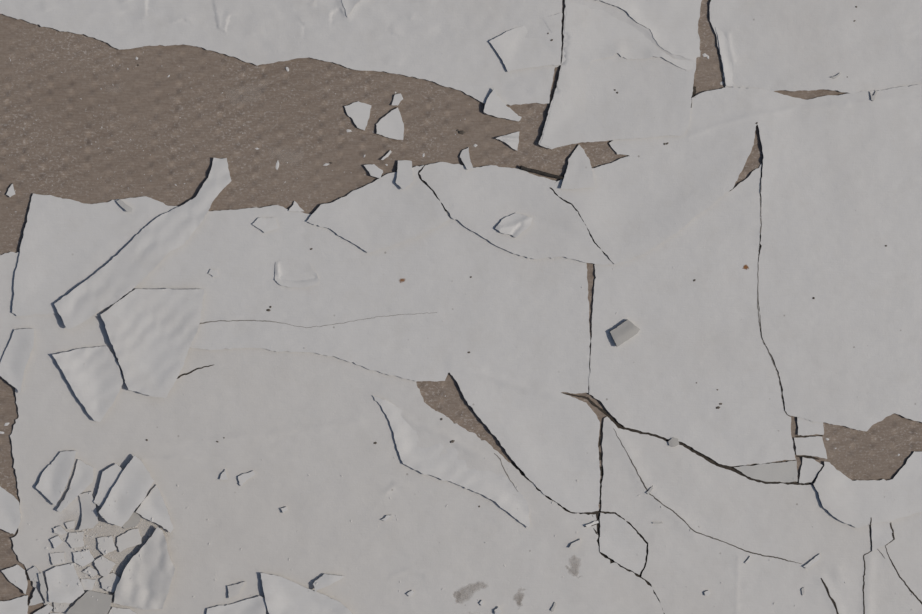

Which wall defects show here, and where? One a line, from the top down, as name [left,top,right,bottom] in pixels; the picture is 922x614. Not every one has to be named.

peeling [0,0,702,529]
peeling [551,0,922,528]
crack [757,162,786,413]
peeling [0,376,59,614]
crack [494,360,823,602]
crack [821,578,839,614]
crack [863,518,922,614]